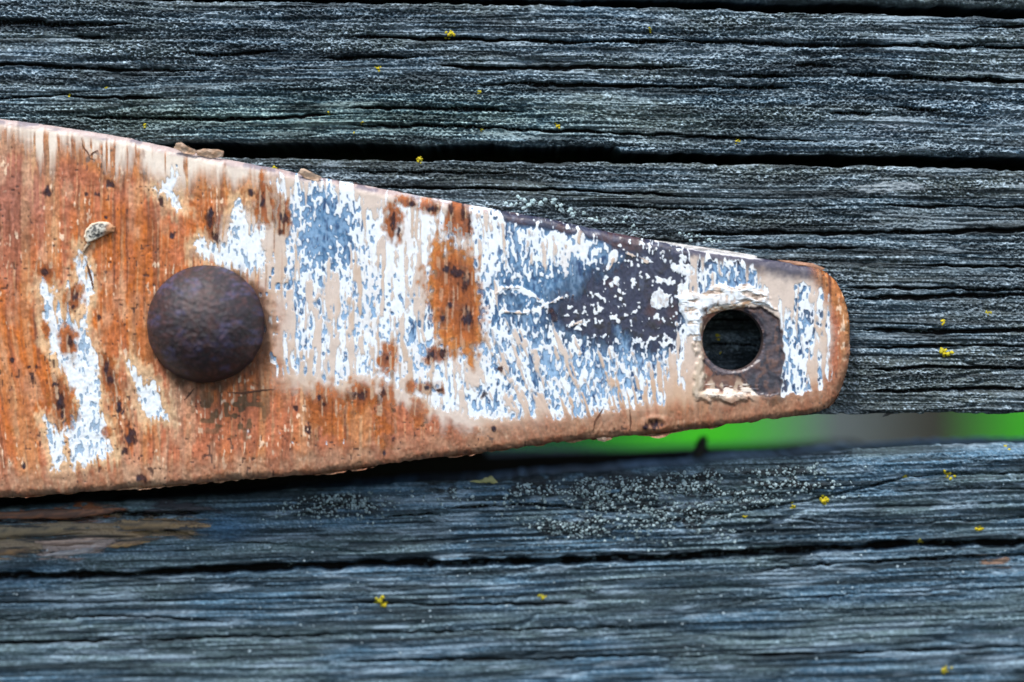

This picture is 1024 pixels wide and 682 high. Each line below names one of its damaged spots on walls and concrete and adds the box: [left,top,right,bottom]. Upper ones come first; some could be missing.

rust [0,129,850,520]
peeling [193,169,832,421]